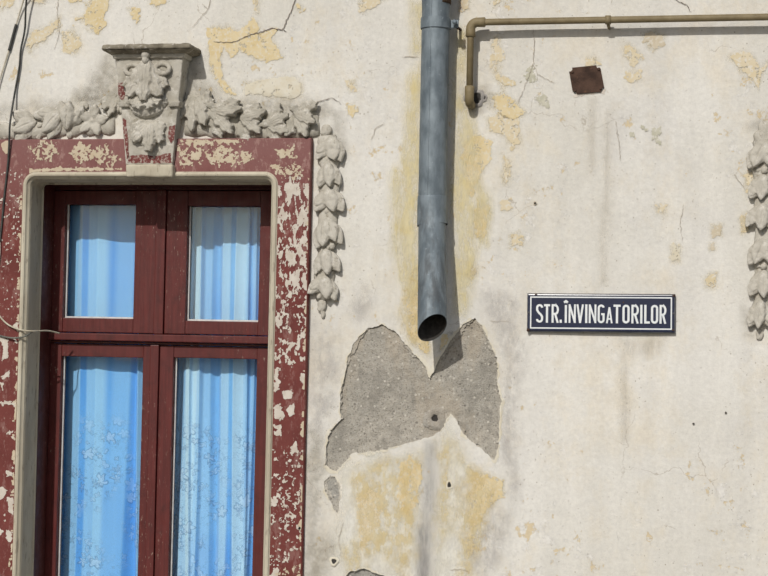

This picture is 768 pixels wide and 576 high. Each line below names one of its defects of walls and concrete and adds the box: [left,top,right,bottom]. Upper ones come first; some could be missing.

peeling [26,0,109,54]
peeling [206,0,301,99]
crack [214,1,295,43]
peeling [176,139,254,168]
peeling [460,38,537,197]
peeling [0,140,122,440]
peeling [269,145,309,576]
flaking render [323,295,505,513]
peeling [0,450,15,570]
flaking render [346,566,384,576]